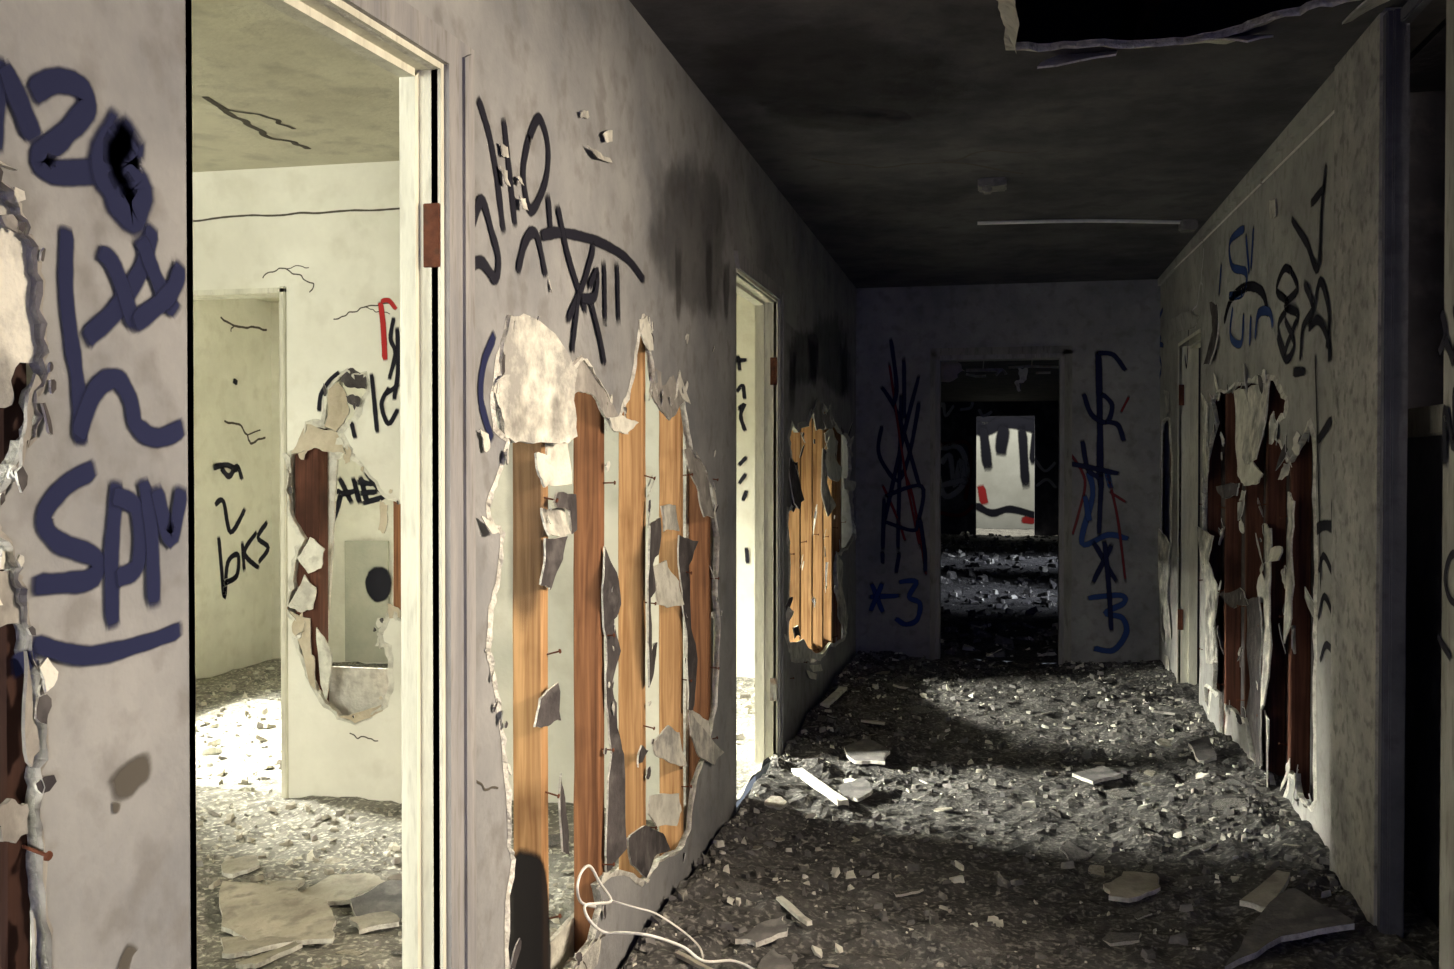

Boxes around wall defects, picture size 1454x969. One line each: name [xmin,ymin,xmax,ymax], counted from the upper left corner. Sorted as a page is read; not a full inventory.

crack [202,97,311,149]
peeling [998,0,1019,52]
peeling [1195,34,1273,44]
peeling [1342,0,1390,24]
spalling [0,161,56,506]
spalling [0,525,58,969]
spalling [282,368,401,725]
spalling [479,314,724,969]
spalling [784,399,857,680]
spalling [1197,302,1318,812]